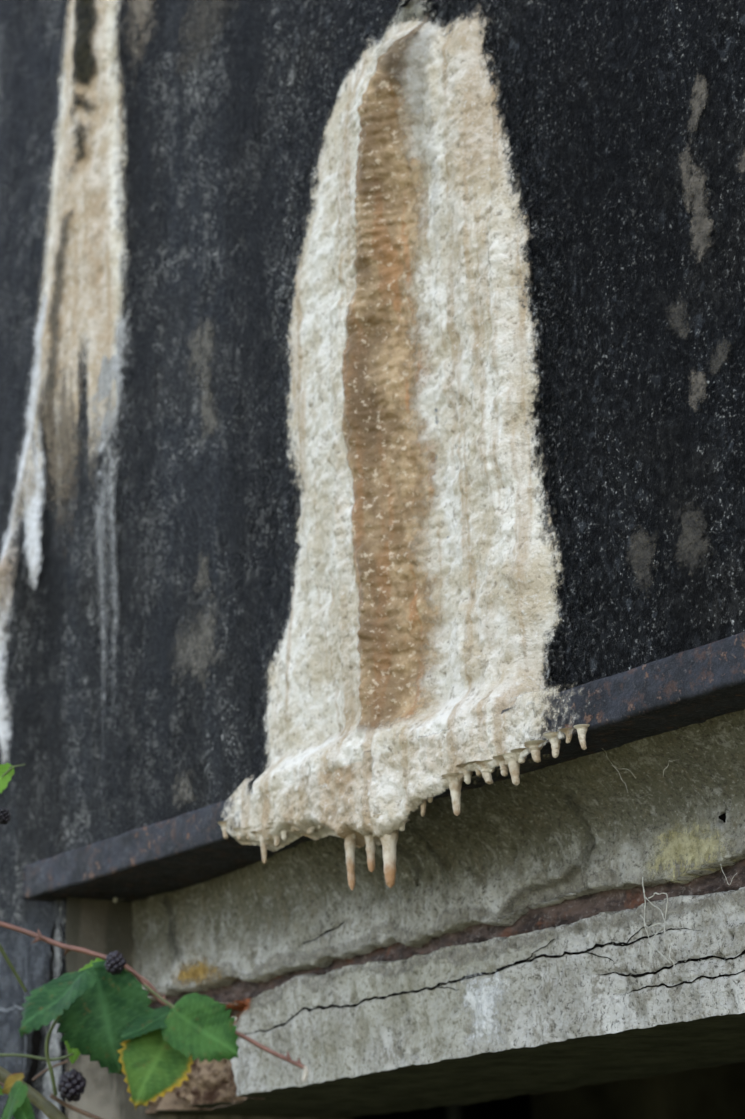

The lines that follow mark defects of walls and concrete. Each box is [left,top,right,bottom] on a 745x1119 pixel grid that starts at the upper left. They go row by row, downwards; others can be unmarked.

crack [389,0,435,28]
leakage [0,0,153,763]
leakage [217,13,594,890]
spalling [164,832,745,1020]
crack [246,920,745,1035]
spalling [220,1060,248,1106]